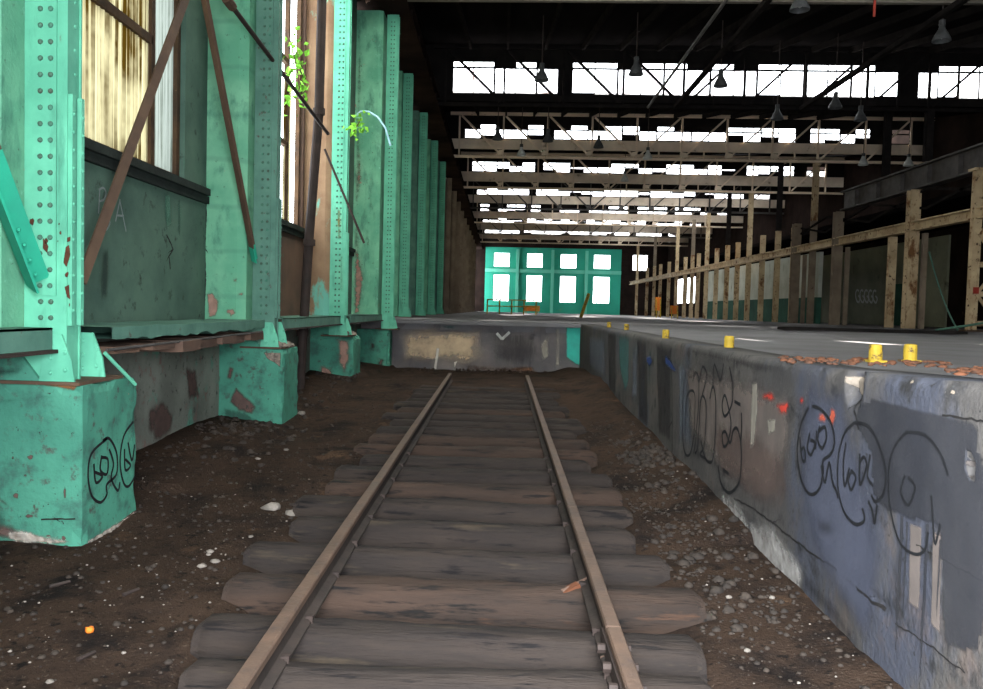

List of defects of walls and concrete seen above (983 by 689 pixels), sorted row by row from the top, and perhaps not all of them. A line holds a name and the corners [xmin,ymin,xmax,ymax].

peeling [354,253,363,313]
peeling [207,294,235,317]
peeling [339,341,348,369]
peeling [231,389,255,413]
flaking render [0,527,66,543]